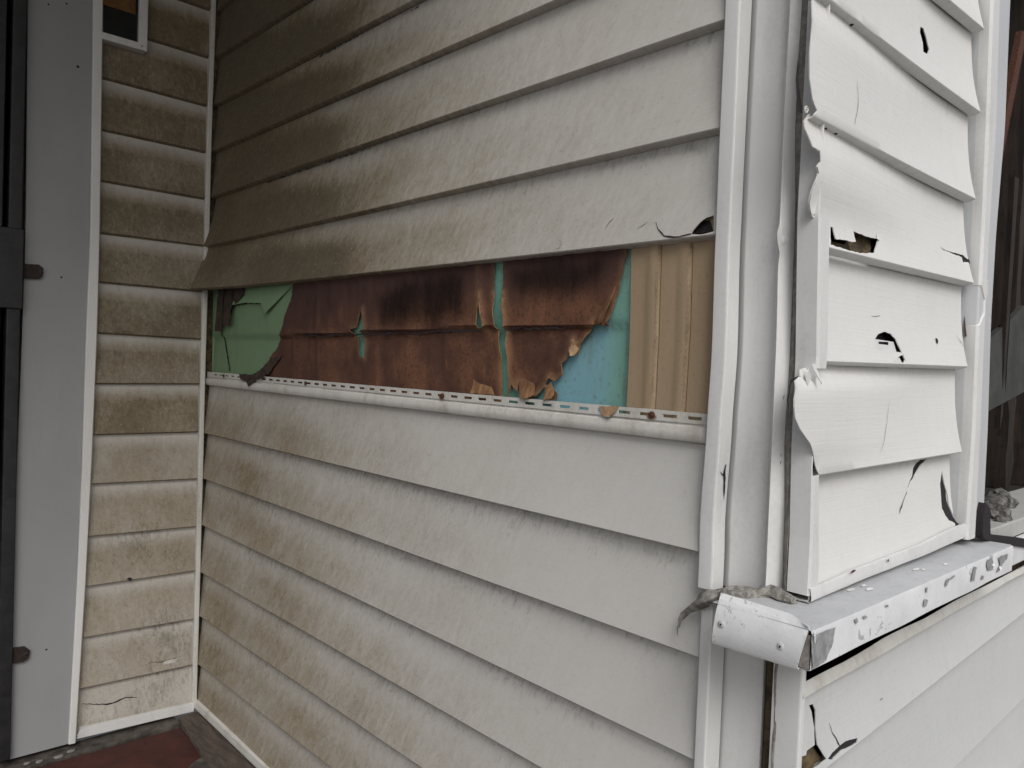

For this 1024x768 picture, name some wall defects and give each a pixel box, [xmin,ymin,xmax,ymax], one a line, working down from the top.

crack [900,460,959,526]
peeling [971,554,1008,581]
crack [828,726,857,759]